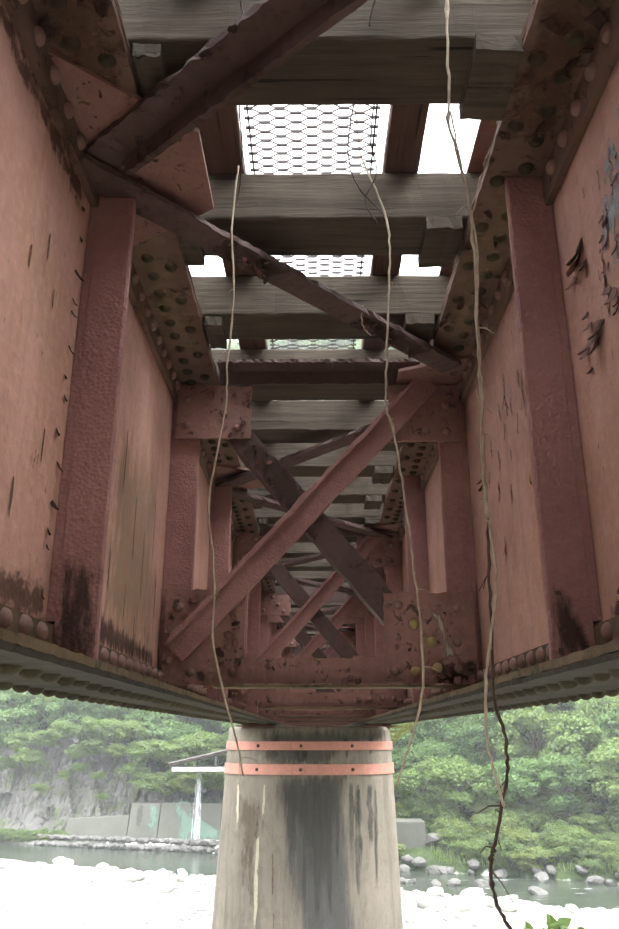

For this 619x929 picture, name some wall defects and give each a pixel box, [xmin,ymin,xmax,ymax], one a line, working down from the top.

peeling [565,237,587,290]
peeling [577,285,619,360]
peeling [598,137,619,274]
rust [0,571,44,620]
water stain [236,784,265,929]
water stain [282,778,378,929]